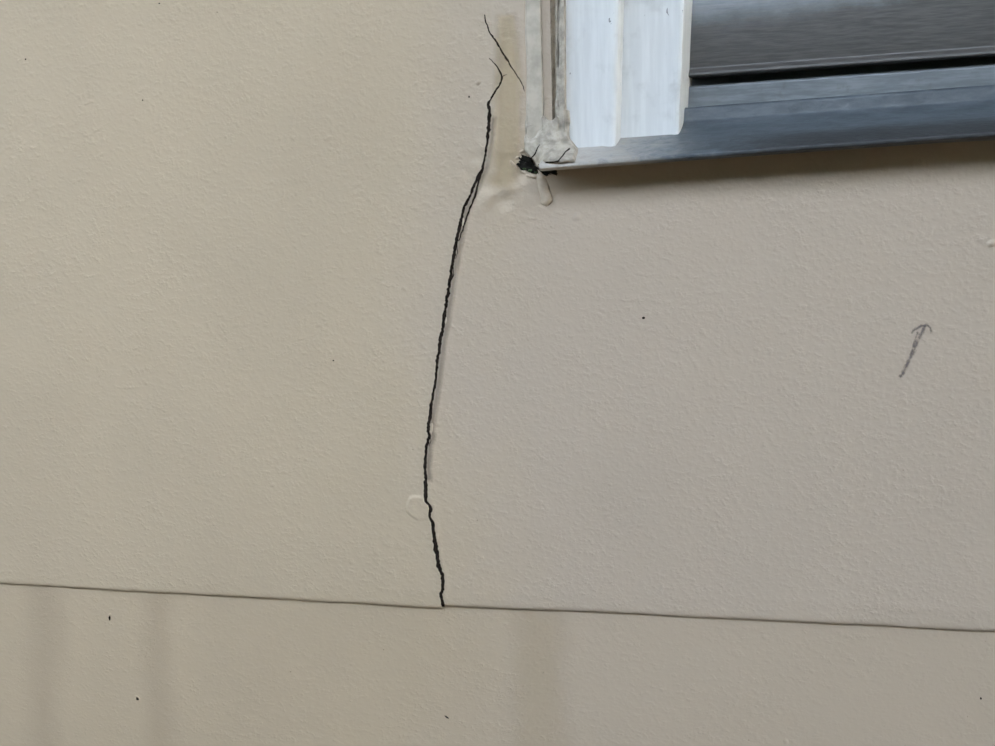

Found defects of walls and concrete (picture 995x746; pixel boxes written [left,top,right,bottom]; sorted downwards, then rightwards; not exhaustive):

crack [421,15,525,607]